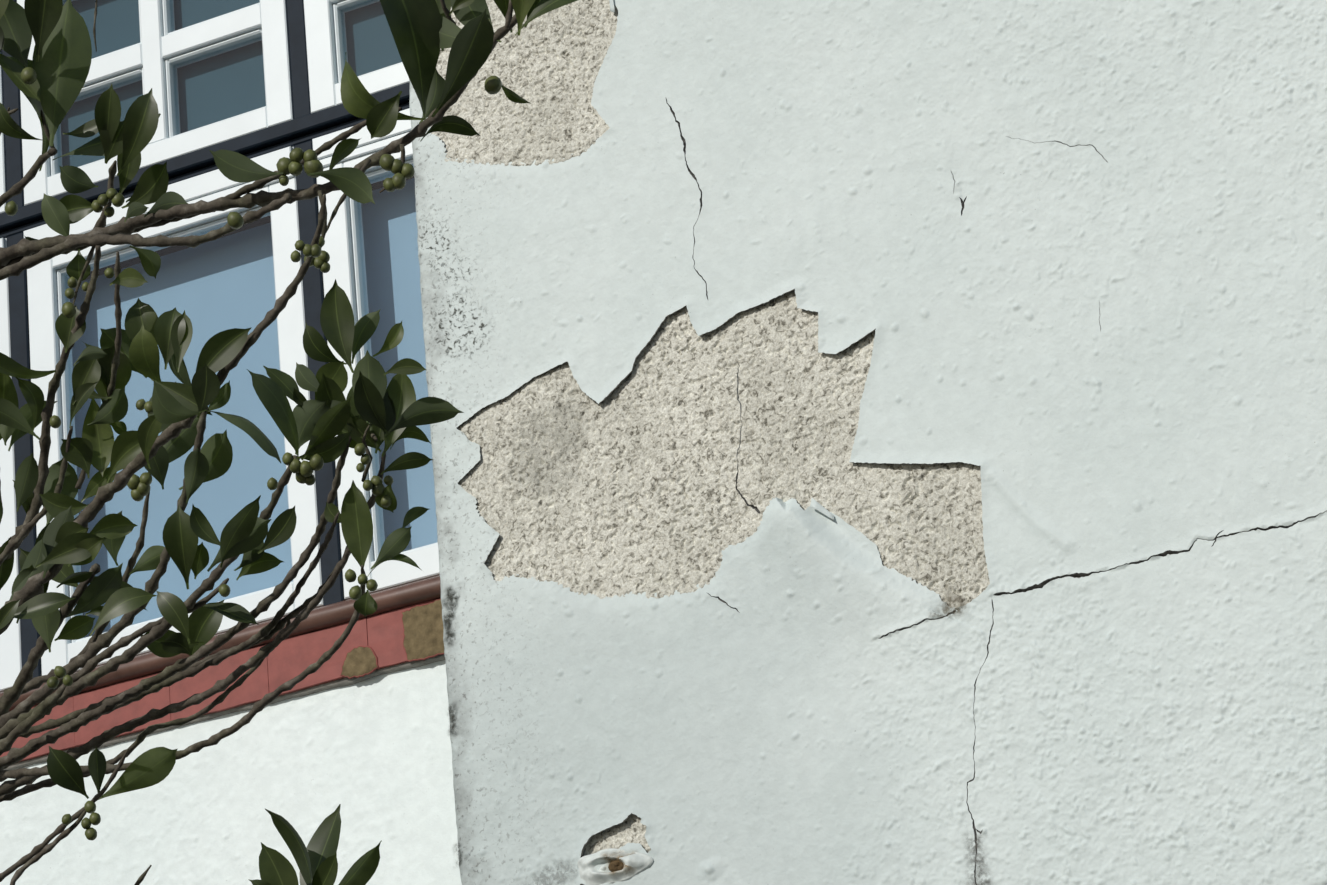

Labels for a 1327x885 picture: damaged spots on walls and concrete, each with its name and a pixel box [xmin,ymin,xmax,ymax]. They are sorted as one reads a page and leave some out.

peeling [431,0,618,166]
crack [666,99,708,299]
peeling [457,289,990,614]
crack [878,610,955,639]
crack [966,511,1326,885]
spalling [580,813,651,858]